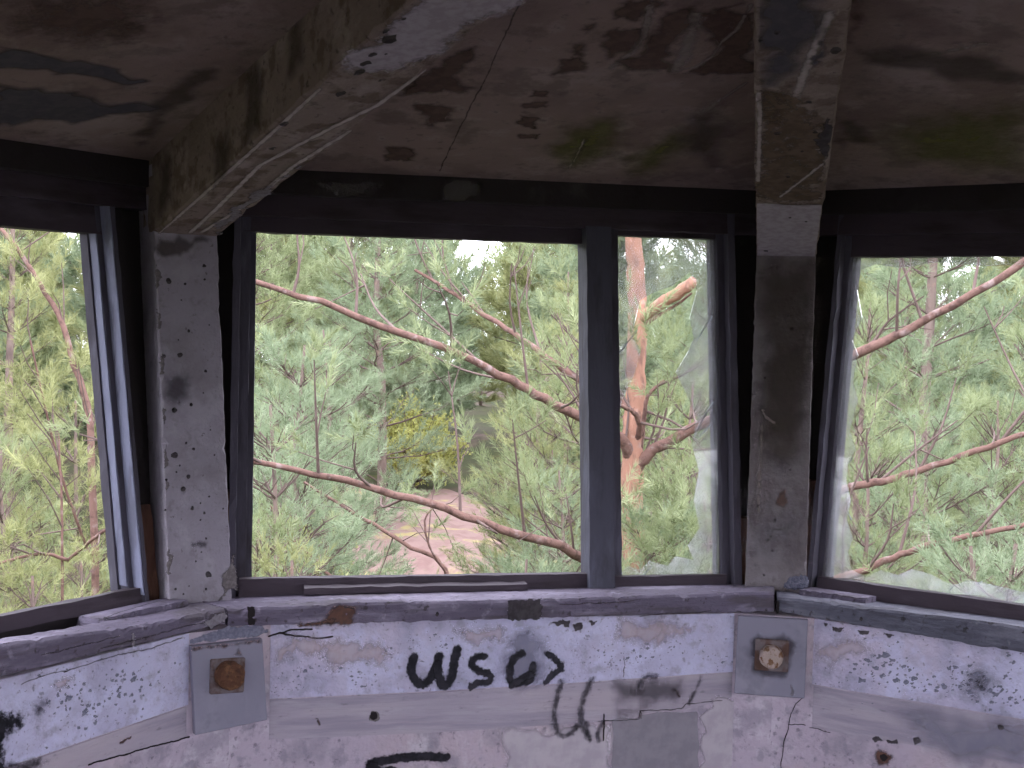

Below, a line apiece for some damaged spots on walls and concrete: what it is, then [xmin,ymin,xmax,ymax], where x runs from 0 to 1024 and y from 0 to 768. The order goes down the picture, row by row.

damp [0,49,148,85]
damp [0,70,212,136]
crack [439,5,520,171]
damp [517,91,548,139]
damp [553,44,587,75]
crack [268,628,333,639]
rust [299,605,356,627]
peeling [503,712,699,768]
crack [598,700,722,741]
crack [780,698,830,766]